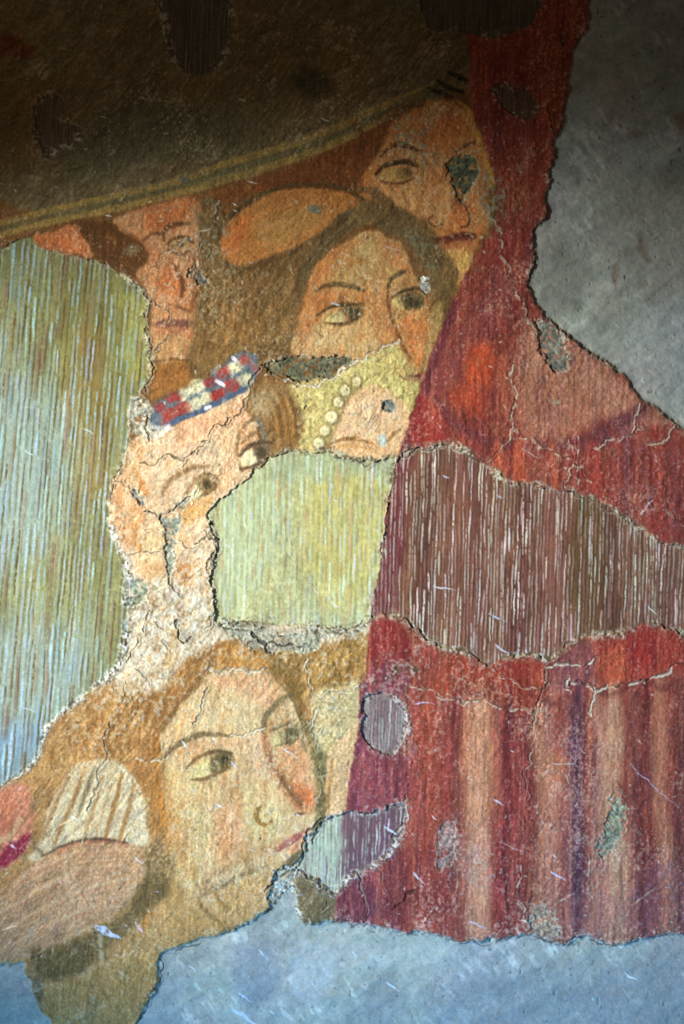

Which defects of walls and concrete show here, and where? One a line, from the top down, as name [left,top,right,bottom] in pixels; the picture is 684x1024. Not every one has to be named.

spalling [445,153,481,202]
spalling [527,0,684,430]
crack [109,200,400,557]
crack [402,364,672,498]
crack [169,530,222,593]
spalling [222,621,323,656]
crack [408,641,684,803]
spalling [596,792,628,860]
spalling [0,962,52,1024]
spalling [139,871,684,1024]